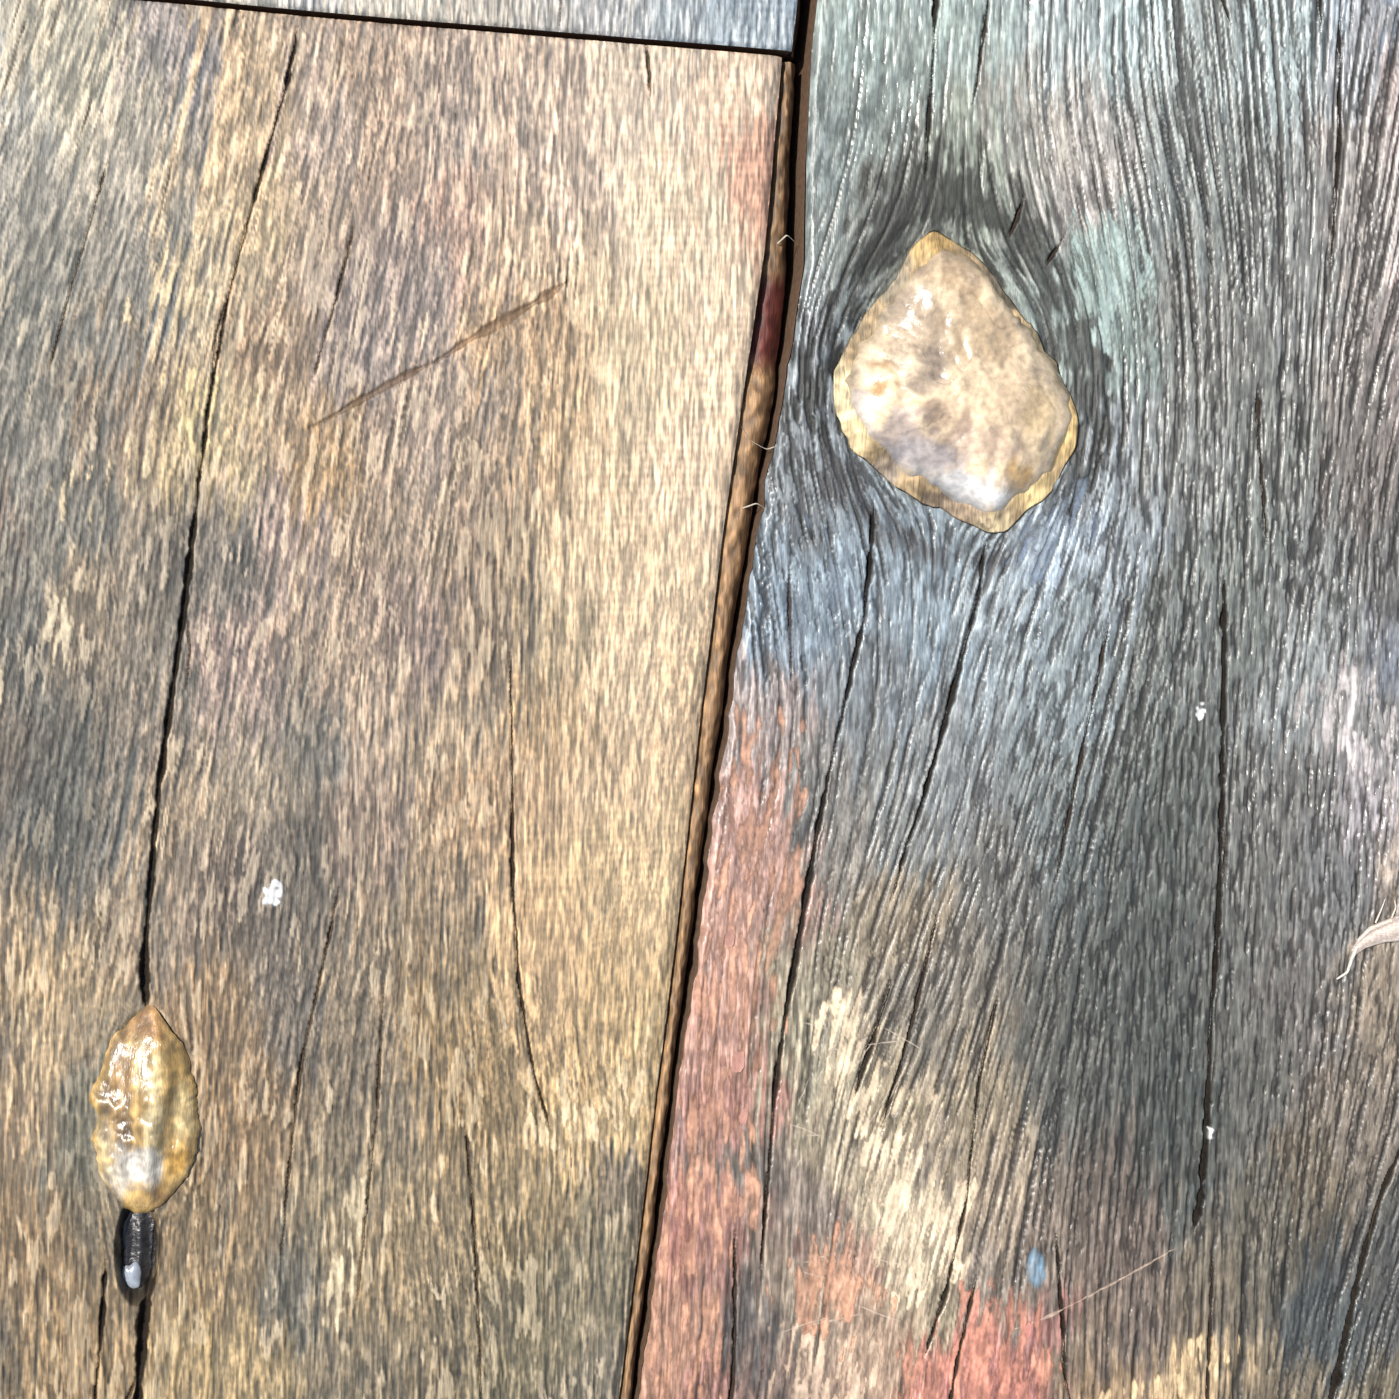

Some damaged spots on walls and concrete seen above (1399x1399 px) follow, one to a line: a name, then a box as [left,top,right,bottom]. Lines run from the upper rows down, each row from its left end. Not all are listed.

crack [1221,0,1229,19]
crack [139,31,297,1003]
crack [510,662,548,1122]
crack [728,506,874,1399]
crack [855,921,936,1121]
crack [893,542,986,894]
crack [1192,582,1227,1227]
crack [94,1222,156,1399]
crack [1328,1149,1399,1399]